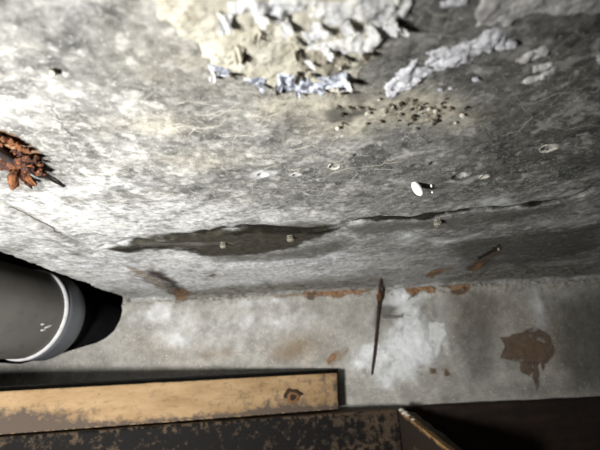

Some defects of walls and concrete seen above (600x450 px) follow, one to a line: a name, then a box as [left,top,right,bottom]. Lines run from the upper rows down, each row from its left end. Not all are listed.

peeling [156,0,410,131]
spalling [378,97,453,131]
rust [0,131,65,190]
crack [490,197,567,208]
crack [177,207,475,234]
leakage [109,223,342,261]
rust [275,290,369,300]
rust [405,286,436,299]
rust [449,284,471,295]
rust [501,329,554,387]